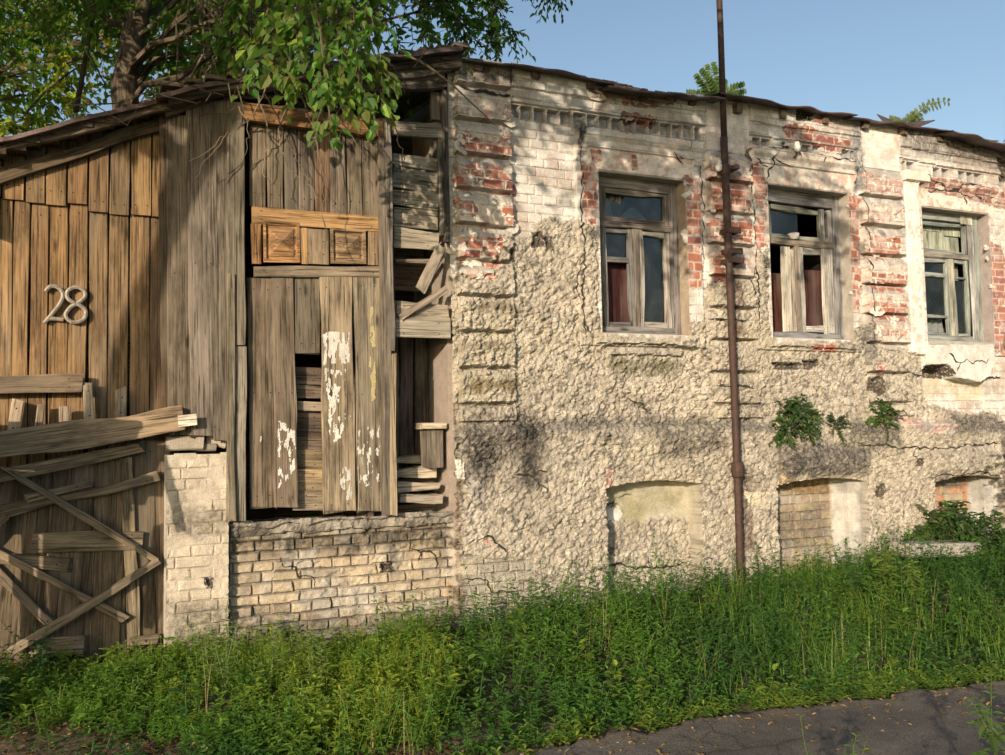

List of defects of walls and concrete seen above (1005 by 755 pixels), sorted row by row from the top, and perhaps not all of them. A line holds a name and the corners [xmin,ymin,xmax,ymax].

peeling [452,132,519,280]
crack [576,125,591,340]
peeling [681,161,768,290]
crack [710,146,877,356]
peeling [846,172,908,339]
peeling [984,241,1005,357]
peeling [323,331,351,442]
crack [950,353,1000,379]
peeling [340,425,380,501]
crack [469,535,508,553]